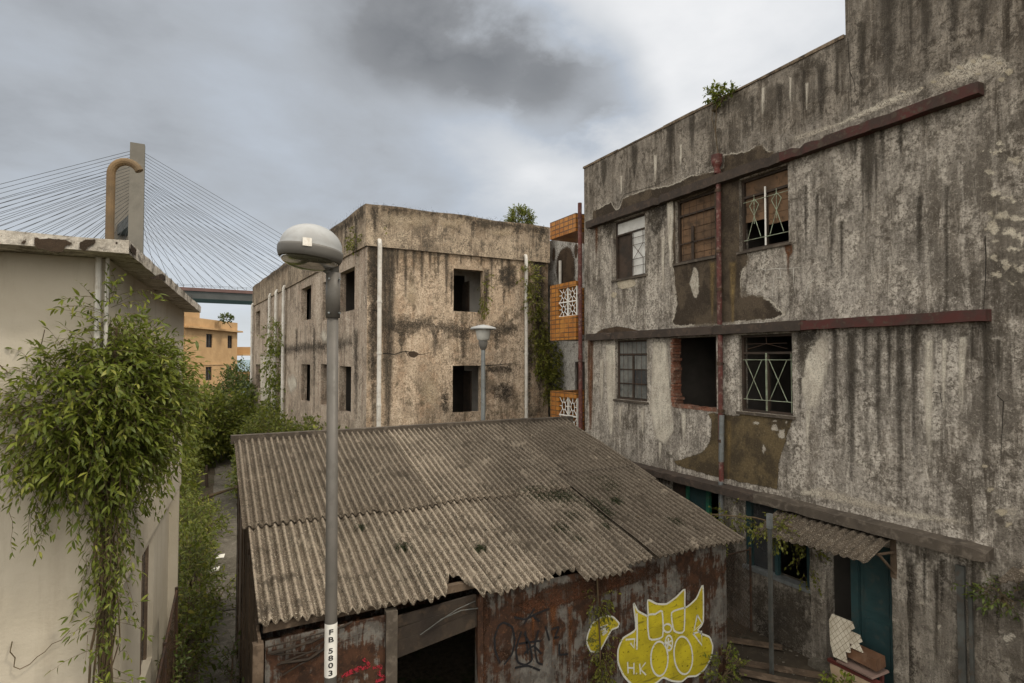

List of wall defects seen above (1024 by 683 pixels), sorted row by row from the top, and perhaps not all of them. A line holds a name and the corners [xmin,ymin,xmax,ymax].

damp [777,48,838,112]
damp [654,117,694,181]
peeling [21,237,96,252]
damp [260,207,476,426]
damp [461,255,517,307]
damp [456,216,545,242]
damp [528,262,546,417]
peeling [592,144,786,327]
damp [485,366,514,403]
damp [796,326,999,472]
peeling [674,411,810,489]
corrosion [511,563,663,658]